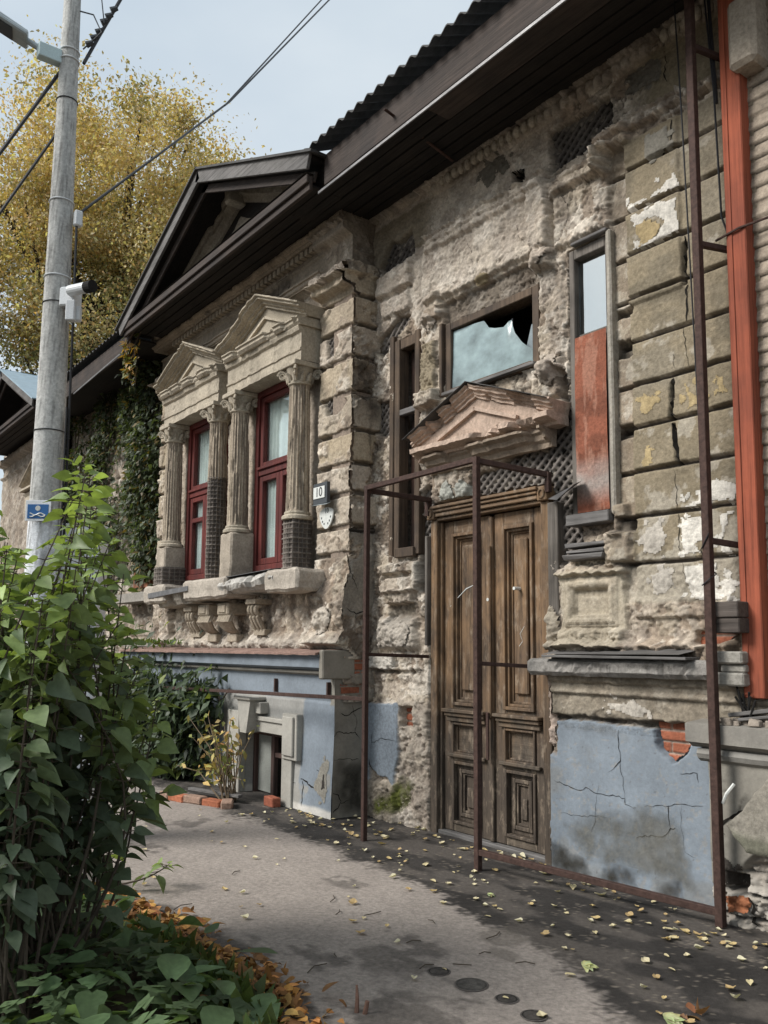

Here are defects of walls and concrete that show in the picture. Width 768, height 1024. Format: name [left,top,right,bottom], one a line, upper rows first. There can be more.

peeling [626,173,679,251]
crack [670,236,689,579]
peeling [635,478,740,601]
crack [293,706,394,811]
damp [553,827,593,872]
crack [554,739,692,857]
flaking render [602,694,691,761]